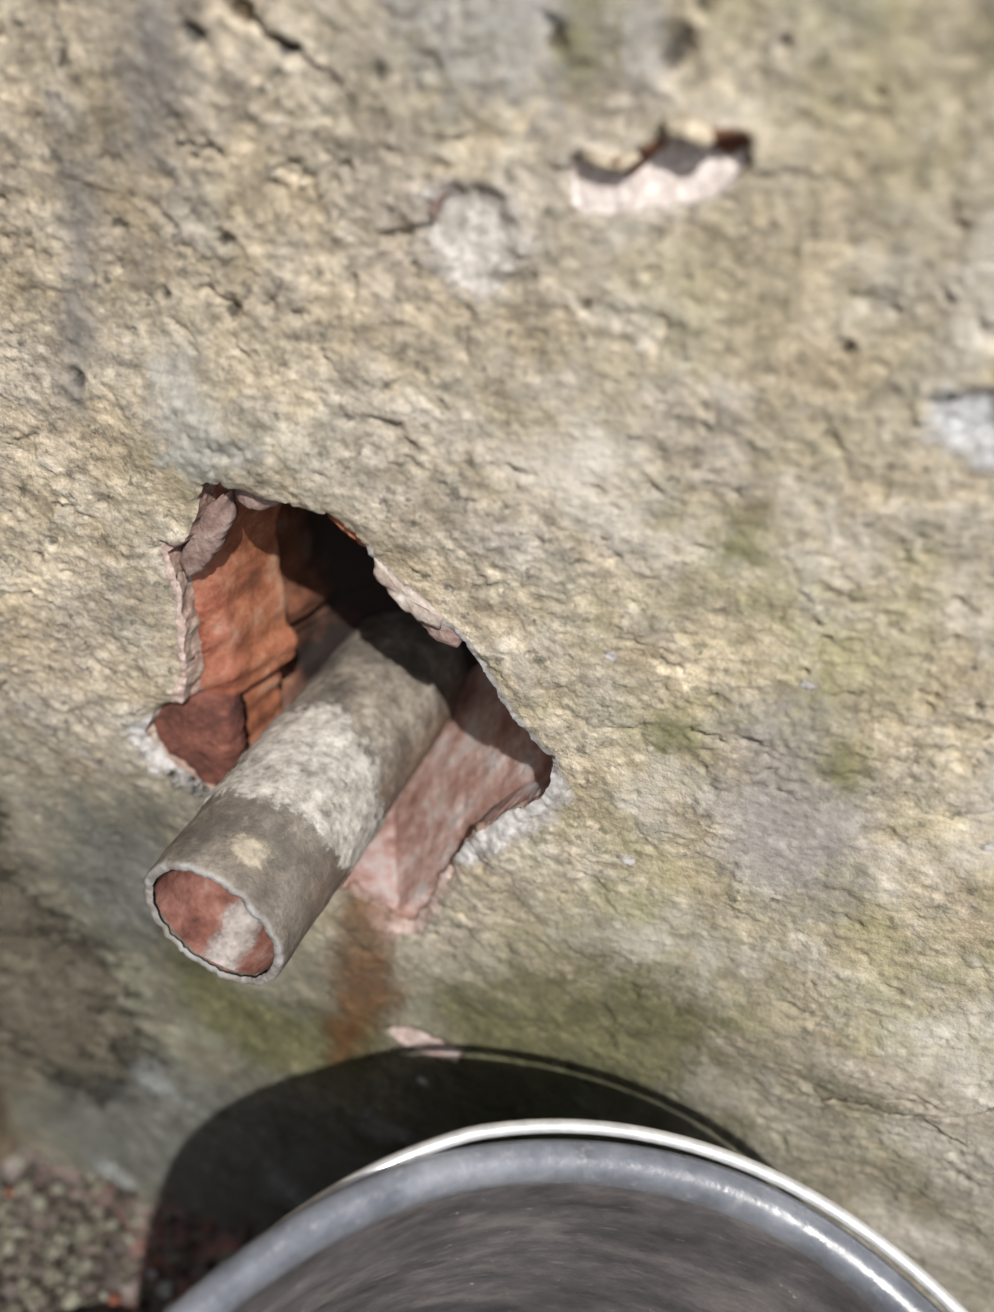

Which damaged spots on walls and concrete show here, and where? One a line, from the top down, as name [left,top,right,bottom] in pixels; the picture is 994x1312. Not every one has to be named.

crack [226,0,354,99]
spalling [567,111,751,217]
spalling [126,482,573,941]
leakage [0,798,386,1225]